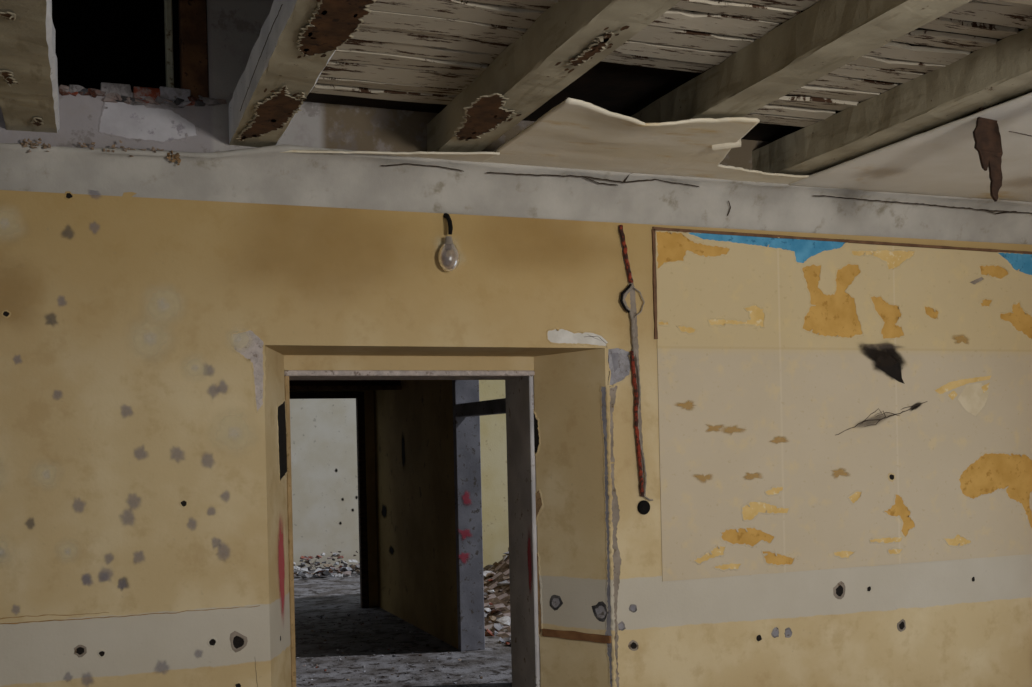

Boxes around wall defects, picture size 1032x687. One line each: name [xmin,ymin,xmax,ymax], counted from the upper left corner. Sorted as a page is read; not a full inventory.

peeling [297,0,376,58]
peeling [236,85,307,141]
peeling [454,93,522,141]
peeling [712,139,741,151]
crack [381,163,699,187]
peeling [656,231,915,341]
crack [836,401,927,435]
flaking render [546,224,647,687]
peeling [692,485,795,572]
peeling [869,473,916,556]
peeling [958,451,1032,530]